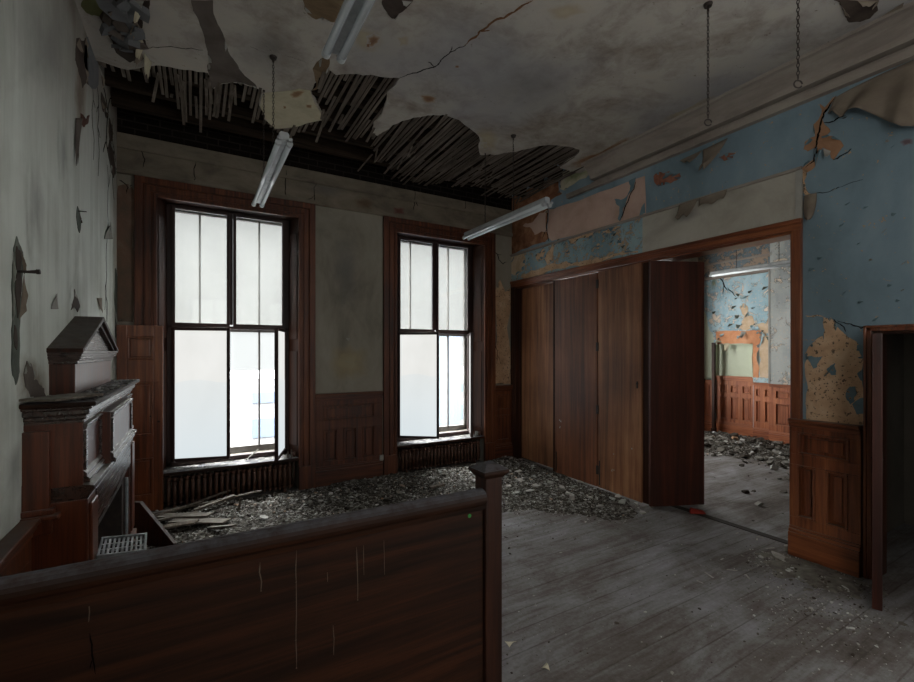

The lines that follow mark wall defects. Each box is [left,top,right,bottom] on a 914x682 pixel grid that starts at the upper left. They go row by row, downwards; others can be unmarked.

peeling [191,0,321,129]
peeling [303,0,344,22]
peeling [382,0,413,19]
crack [400,0,533,78]
peeling [834,0,904,23]
spalling [75,37,134,338]
peeling [511,171,681,278]
spalling [802,97,844,220]
crack [805,96,851,168]
peeling [11,236,46,397]
spalling [704,286,768,380]
spalling [805,317,863,425]